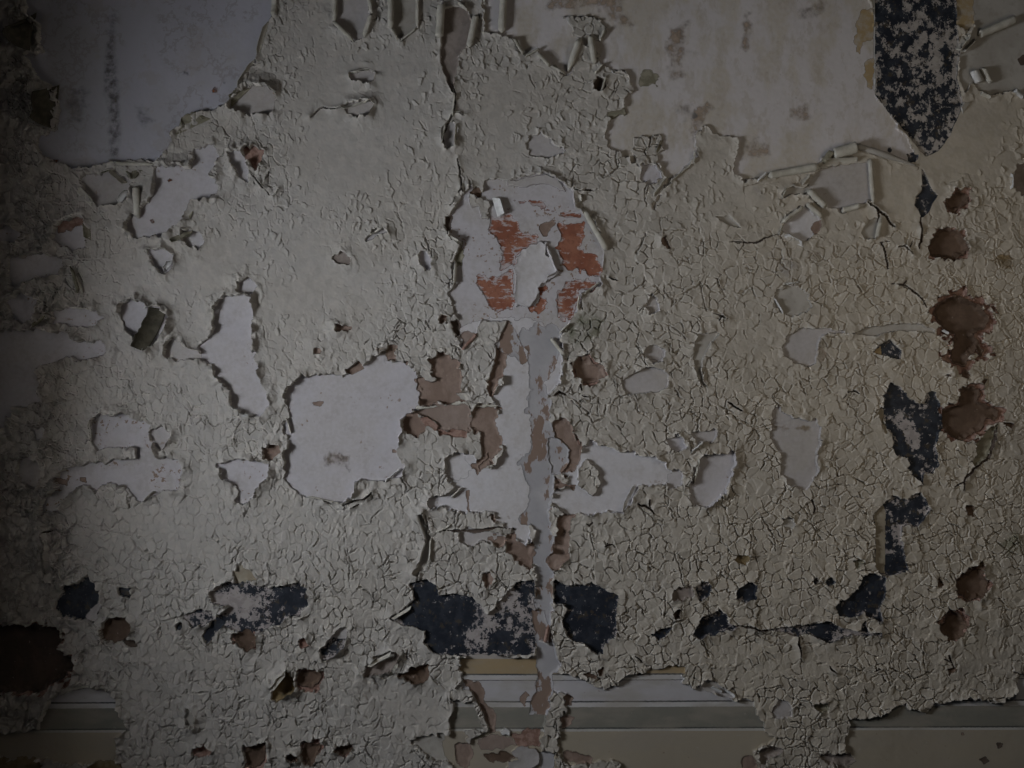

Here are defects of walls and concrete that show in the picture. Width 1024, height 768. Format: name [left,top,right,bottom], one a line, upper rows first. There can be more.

peeling [956,0,1024,99]
peeling [2,0,277,274]
peeling [435,0,918,247]
crack [867,202,929,313]
peeling [216,173,672,577]
flaking render [782,286,1015,474]
crack [955,427,998,491]
hole [0,621,76,698]
flaking render [482,572,494,589]
peeling [555,605,568,623]
crack [735,624,770,632]
peeling [508,691,568,768]